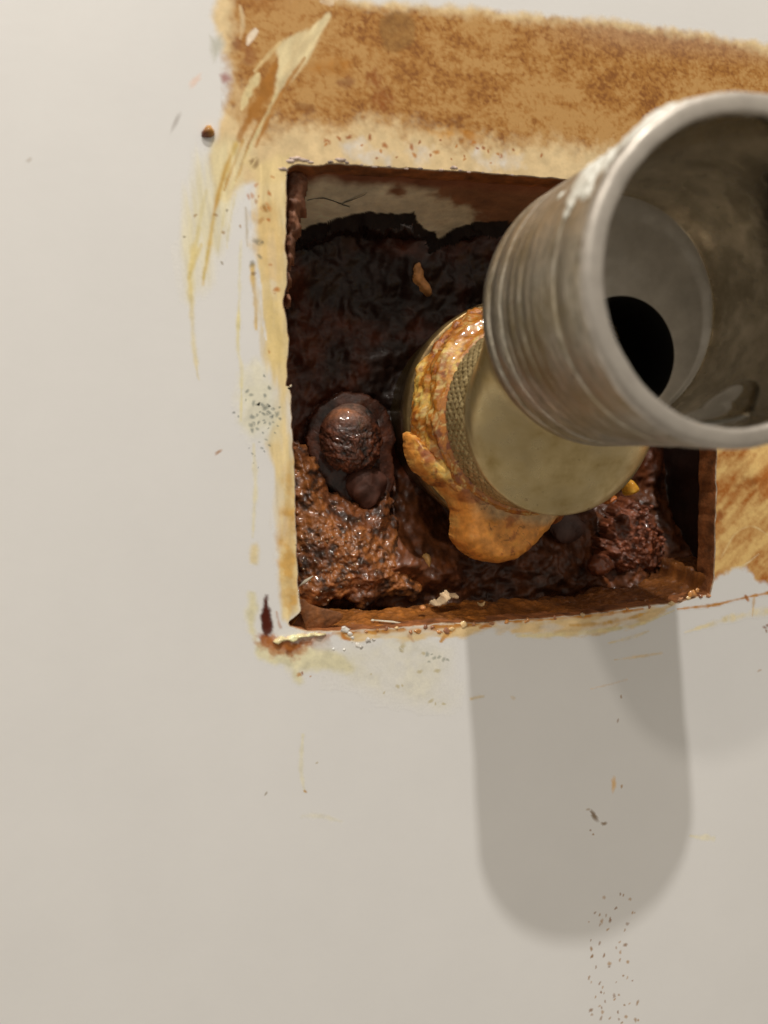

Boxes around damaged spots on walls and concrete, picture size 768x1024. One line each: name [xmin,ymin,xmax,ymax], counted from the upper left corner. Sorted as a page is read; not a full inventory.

corrosion [170,0,768,688]
peeling [622,480,639,496]
peeling [273,632,326,644]
peeling [332,626,376,651]